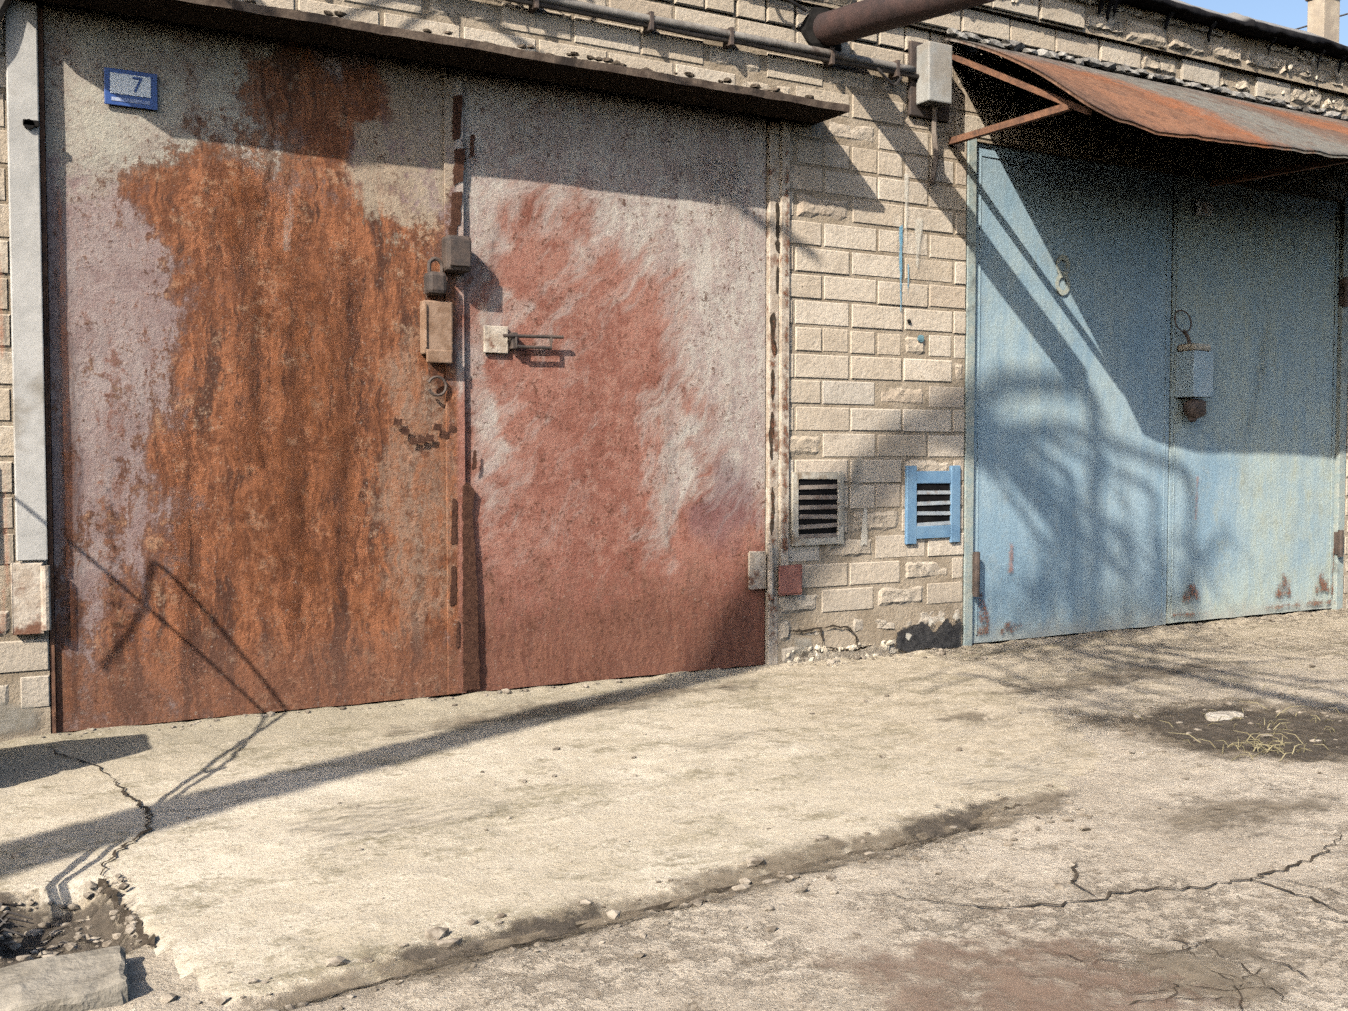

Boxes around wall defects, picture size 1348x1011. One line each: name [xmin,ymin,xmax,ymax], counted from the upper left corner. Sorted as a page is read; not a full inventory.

corrosion [978,593,1022,636]
corrosion [1173,584,1199,617]
corrosion [1268,551,1334,609]
crack [49,747,252,879]
crack [247,791,1348,1011]